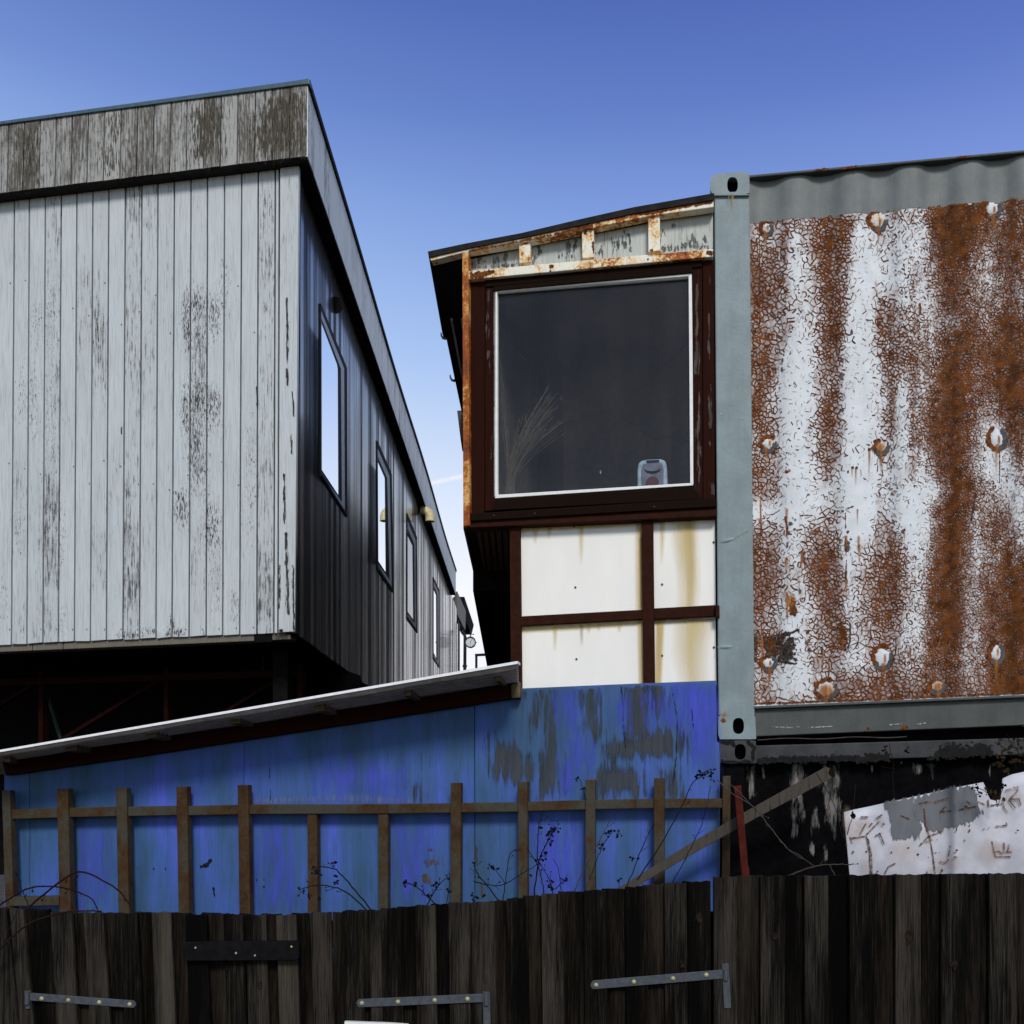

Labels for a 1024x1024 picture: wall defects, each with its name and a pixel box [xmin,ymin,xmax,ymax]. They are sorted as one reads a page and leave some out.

corrosion [638,200,713,215]
peeling [471,253,517,270]
corrosion [469,225,595,266]
peeling [595,230,632,255]
peeling [660,224,714,253]
corrosion [750,199,1024,705]
damp [521,522,705,683]
peeling [754,623,819,664]
peeling [487,690,580,802]
peeling [567,684,716,800]